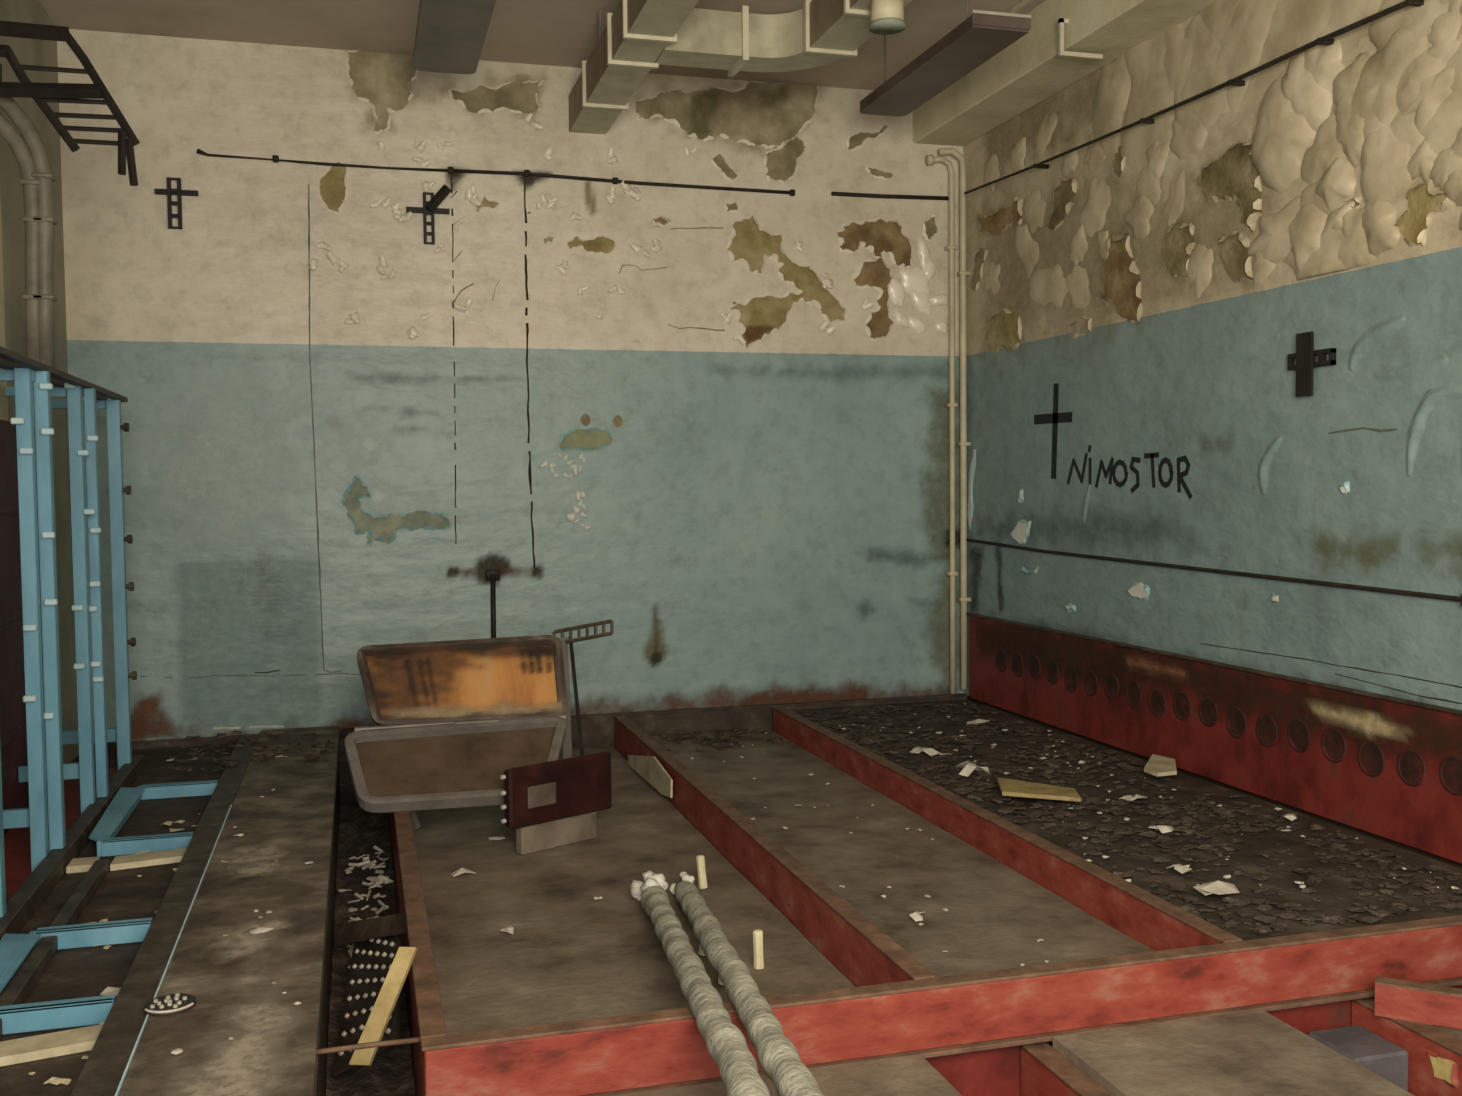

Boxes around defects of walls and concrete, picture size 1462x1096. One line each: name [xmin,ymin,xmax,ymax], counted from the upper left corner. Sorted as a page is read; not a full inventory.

peeling [346,50,418,150]
peeling [448,77,544,129]
peeling [635,82,820,183]
peeling [721,202,938,349]
peeling [341,474,451,546]
peeling [540,414,623,531]